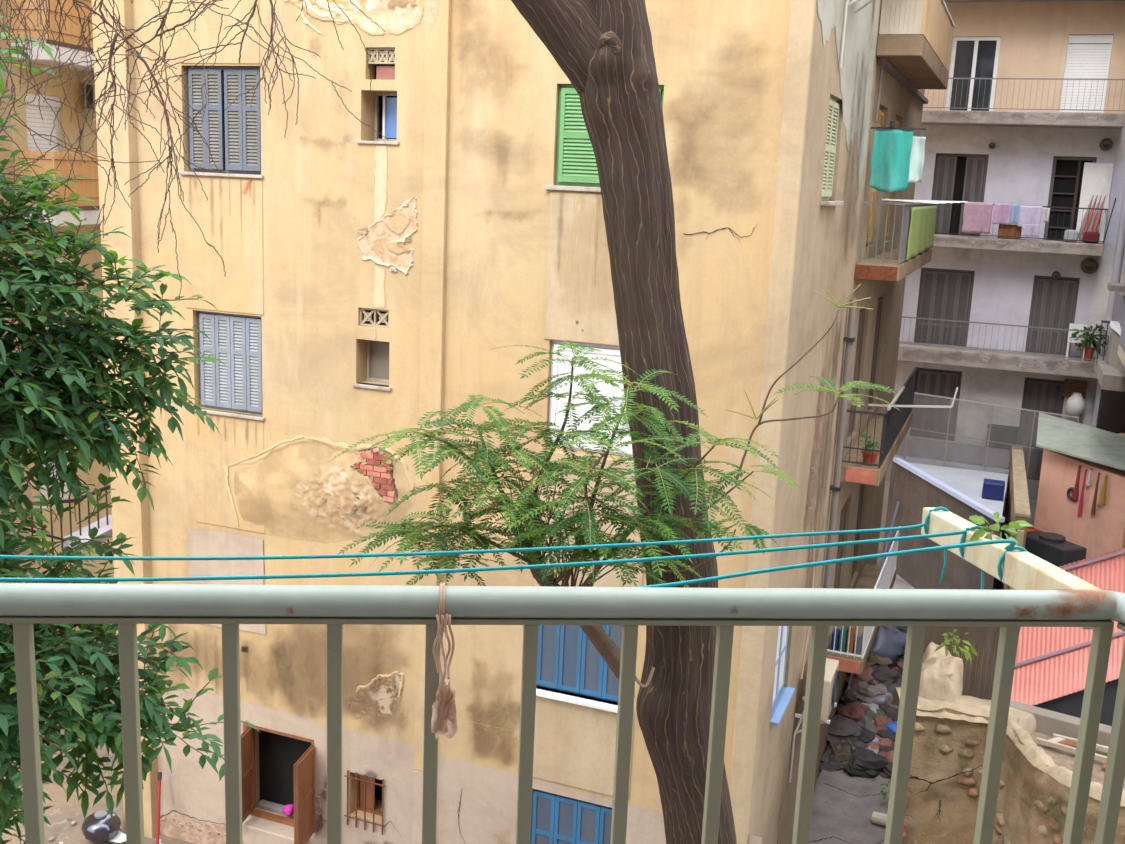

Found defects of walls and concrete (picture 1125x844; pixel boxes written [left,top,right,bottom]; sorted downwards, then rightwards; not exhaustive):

flaking render [284,0,437,36]
flaking render [357,197,418,274]
crack [683,223,758,239]
flaking render [355,448,397,502]
corrosion [1057,589,1107,618]
flaking render [343,671,405,722]
crack [906,765,982,820]